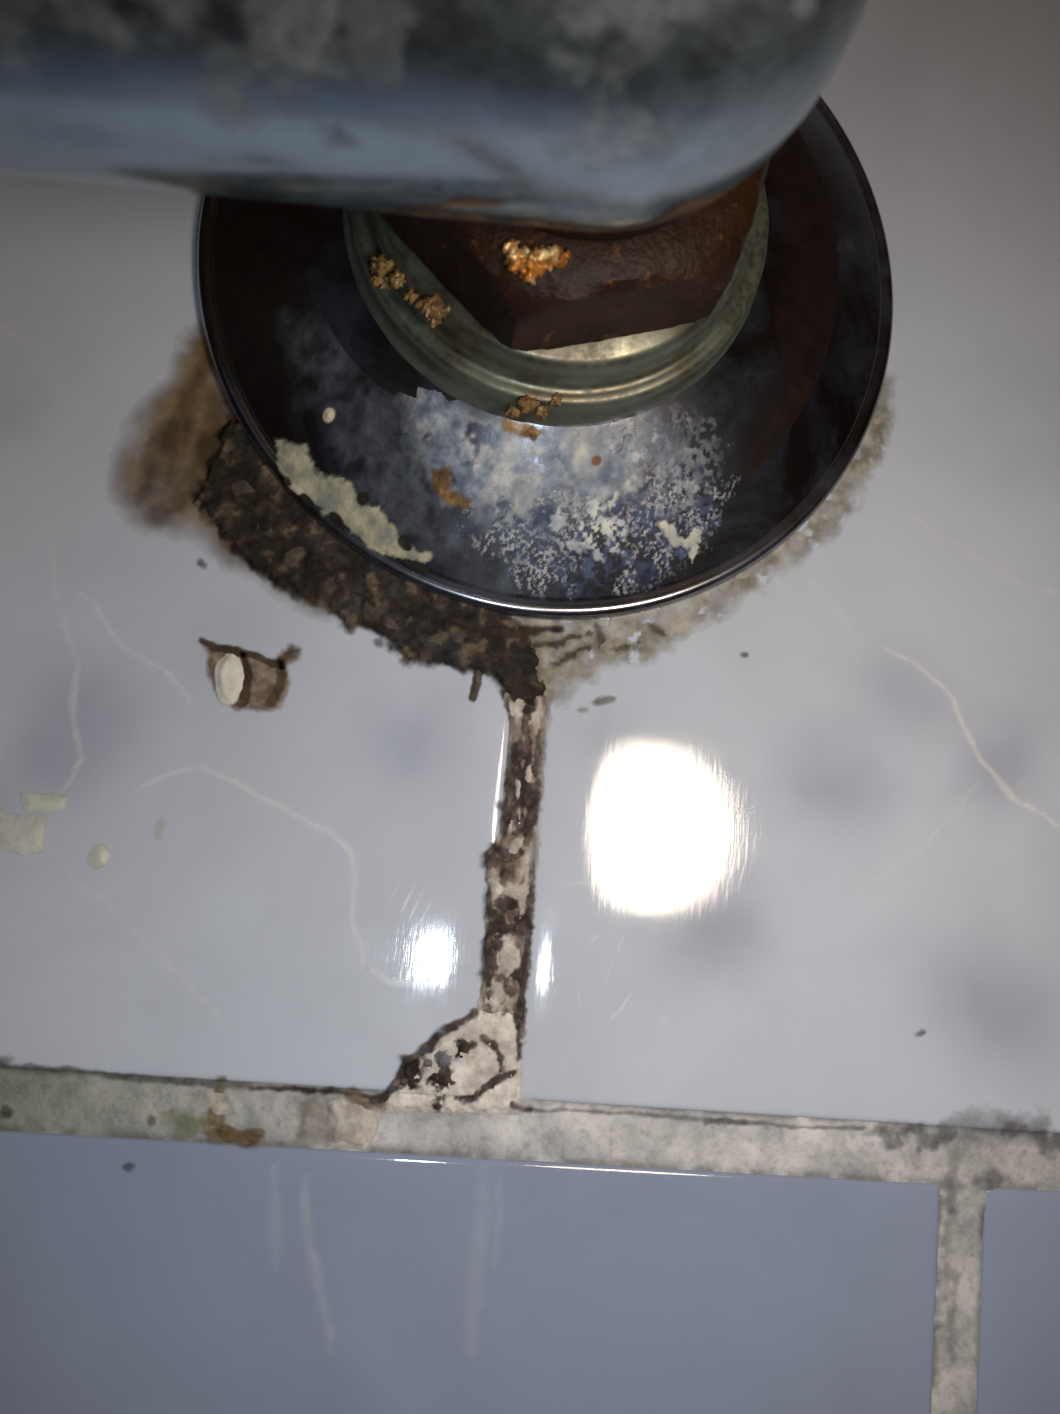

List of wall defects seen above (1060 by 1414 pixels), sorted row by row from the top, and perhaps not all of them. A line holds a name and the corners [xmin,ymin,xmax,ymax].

damp [192,419,564,713]
damp [503,789,541,825]
damp [484,849,528,953]